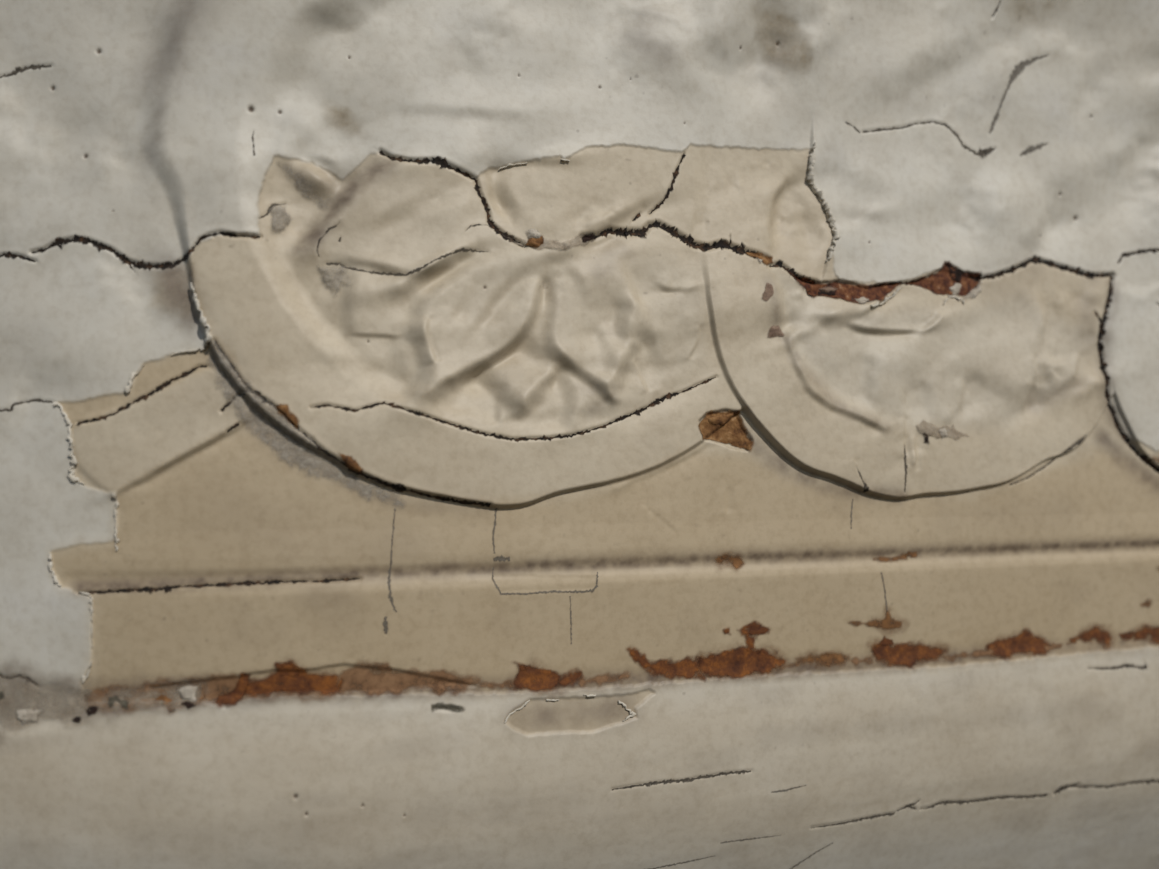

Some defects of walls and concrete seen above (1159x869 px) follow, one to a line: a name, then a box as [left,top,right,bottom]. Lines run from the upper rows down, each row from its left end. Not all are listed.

crack [846,54,1049,158]
crack [0,204,281,270]
crack [317,151,524,276]
crack [596,154,815,285]
peeling [494,142,982,334]
spalling [699,411,754,450]
peeling [0,267,403,728]
crack [76,340,716,644]
spalling [432,703,463,712]
peeling [504,690,654,736]
corrosion [84,611,1159,711]
crack [612,770,751,790]